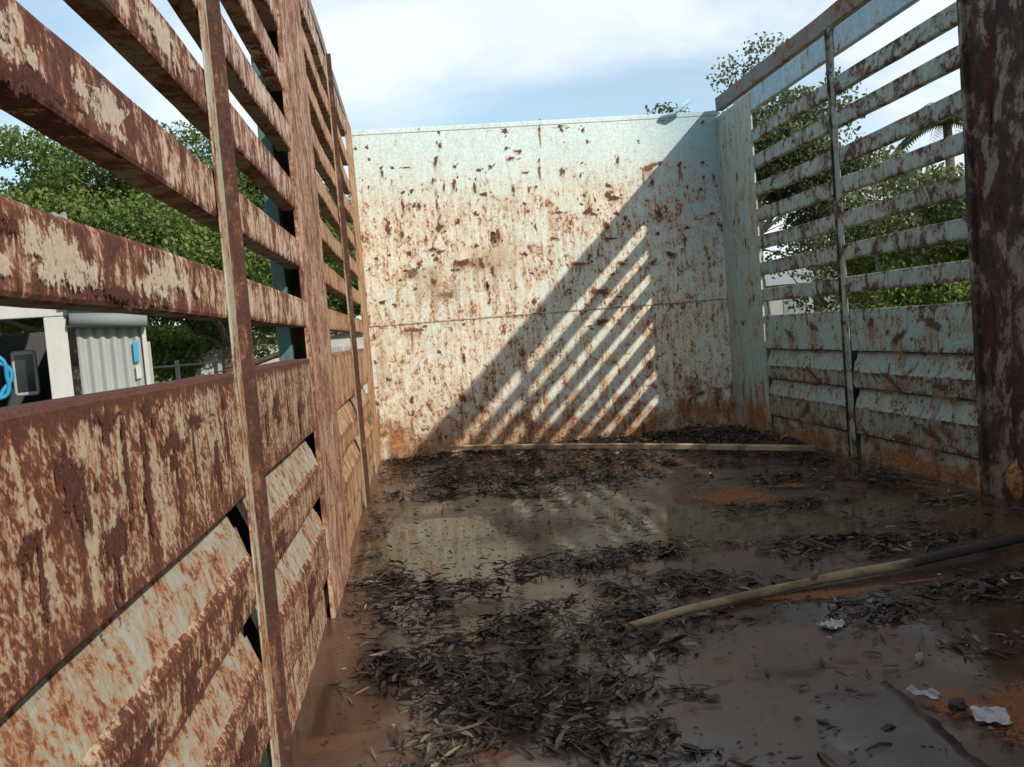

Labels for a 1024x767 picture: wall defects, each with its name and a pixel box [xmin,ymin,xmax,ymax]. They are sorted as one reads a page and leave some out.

rust [0,55,89,117]
rust [87,279,171,313]
rust [863,315,907,408]
rust [265,373,305,458]
rust [376,401,415,452]
rust [49,395,230,629]
rust [13,508,54,650]
rust [228,589,248,651]
rust [308,567,318,627]
rust [177,641,211,722]
rust [121,718,165,767]
rust [234,718,264,767]